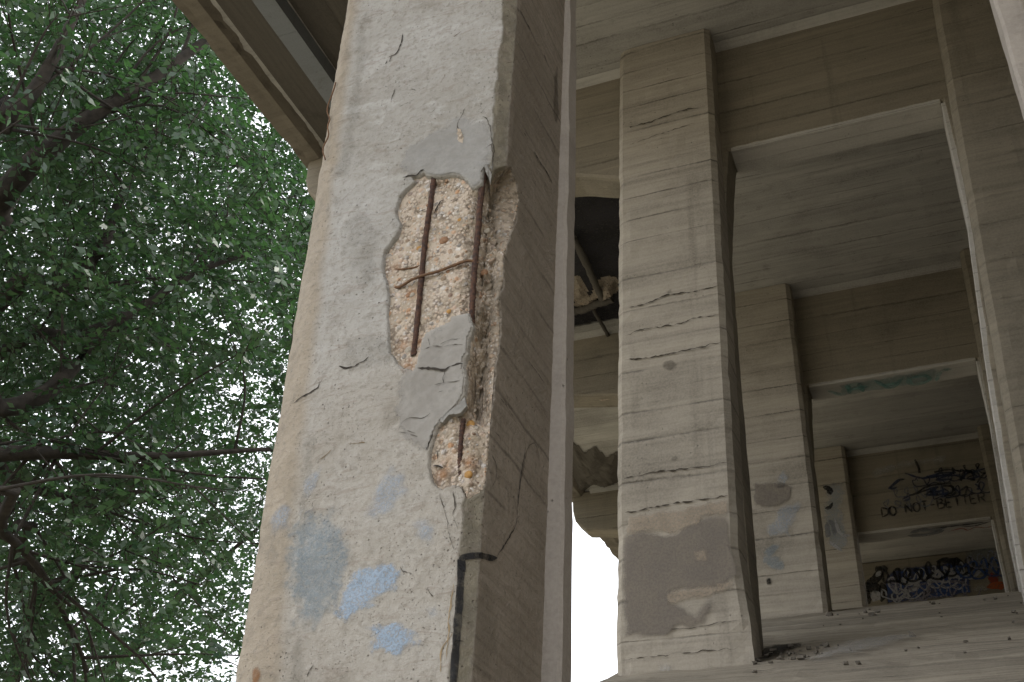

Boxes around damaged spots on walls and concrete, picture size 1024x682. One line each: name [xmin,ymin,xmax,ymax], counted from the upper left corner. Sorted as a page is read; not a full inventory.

crack [630,108,694,145]
spalling [385,118,519,499]
spalling [574,235,619,337]
crack [627,285,720,360]
crack [493,399,540,553]
spalling [572,442,618,491]
crack [624,462,726,479]
crack [625,495,728,513]
leakage [623,517,736,635]